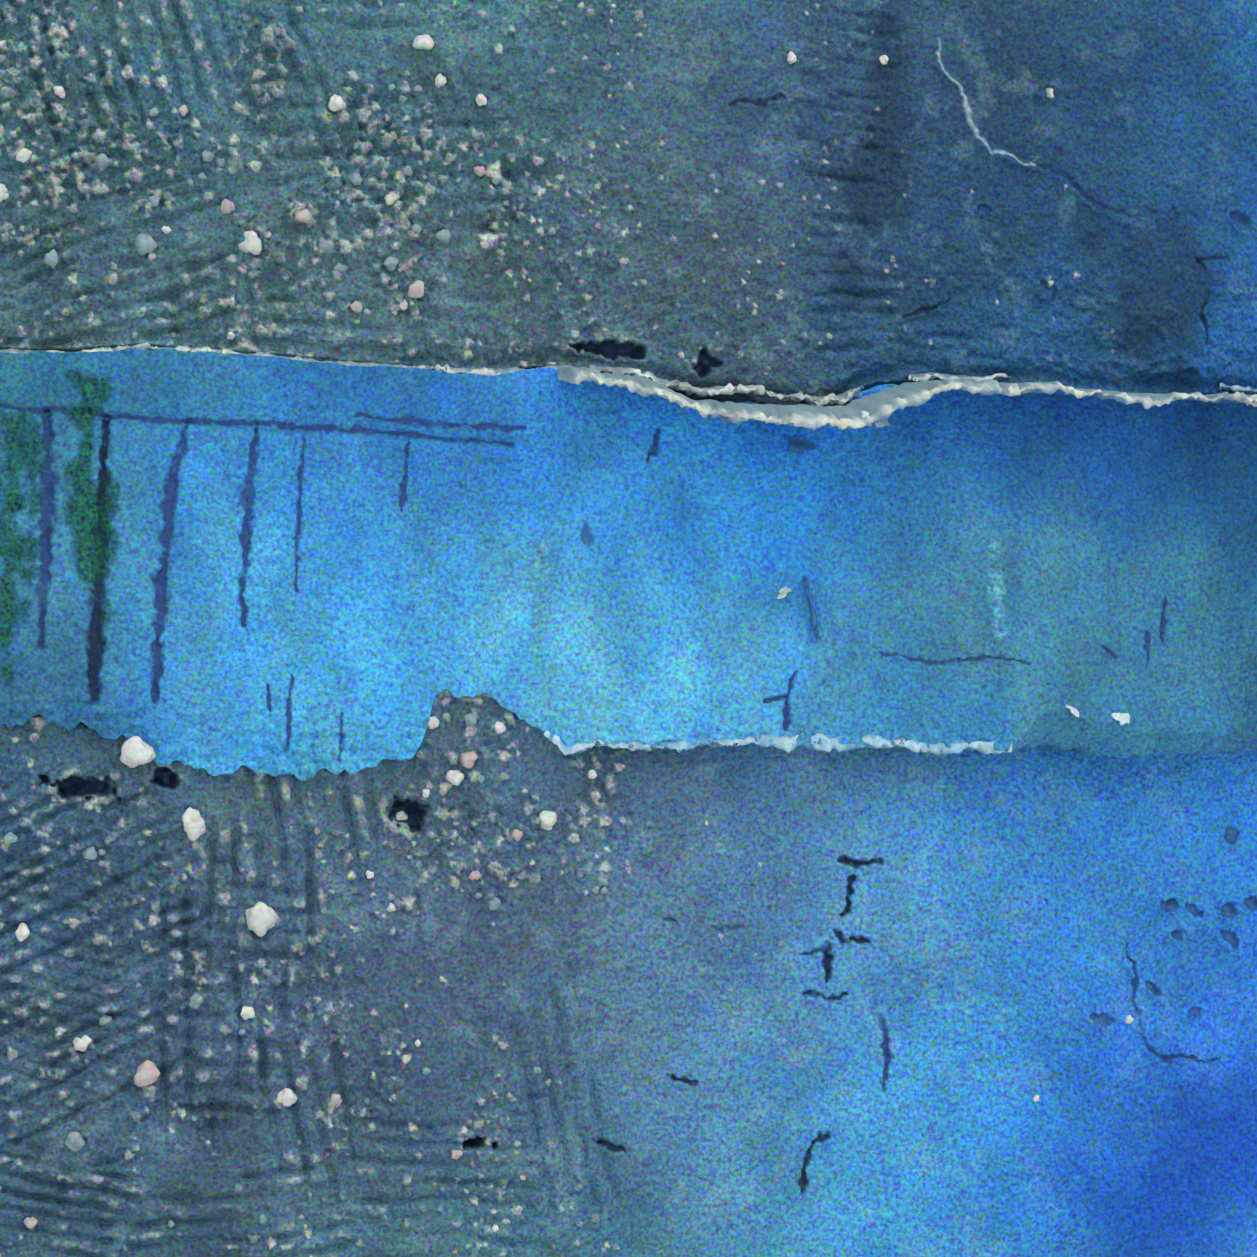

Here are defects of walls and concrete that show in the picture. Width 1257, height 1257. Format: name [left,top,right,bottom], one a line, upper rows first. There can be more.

spalling [694,351,719,378]
peeling [861,411,890,427]
peeling [789,436,815,453]
peeling [582,523,594,544]
peeling [777,575,823,643]
peeling [1111,713,1130,725]
spalling [154,768,177,788]
crack [803,857,883,999]
crack [880,1019,890,1087]
crack [798,1133,830,1194]